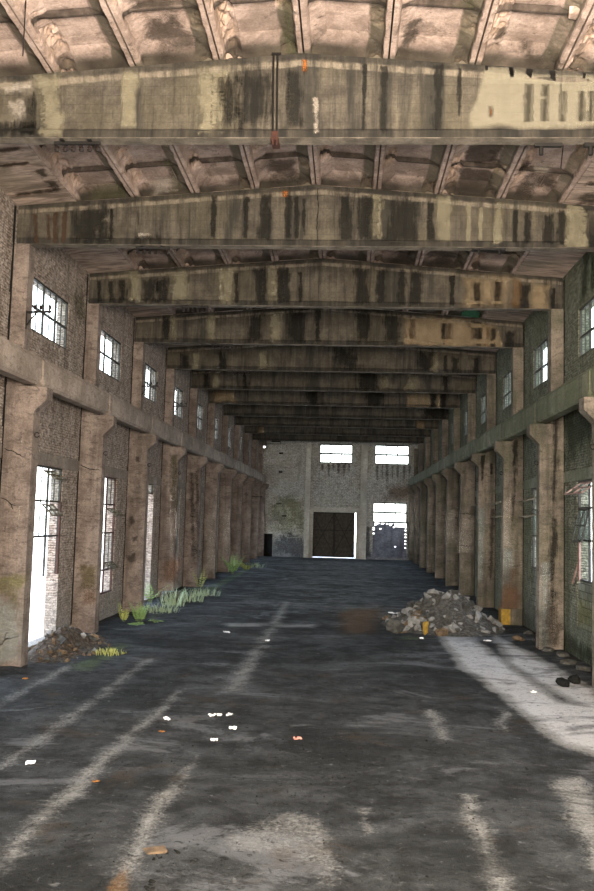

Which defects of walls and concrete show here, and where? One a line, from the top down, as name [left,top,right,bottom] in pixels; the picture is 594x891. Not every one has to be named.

leakage [136,0,198,60]
leakage [198,69,272,133]
leakage [286,69,304,127]
leakage [243,194,272,240]
leakage [284,195,306,238]
leakage [493,160,556,243]
leakage [542,182,594,296]
leakage [334,145,503,406]